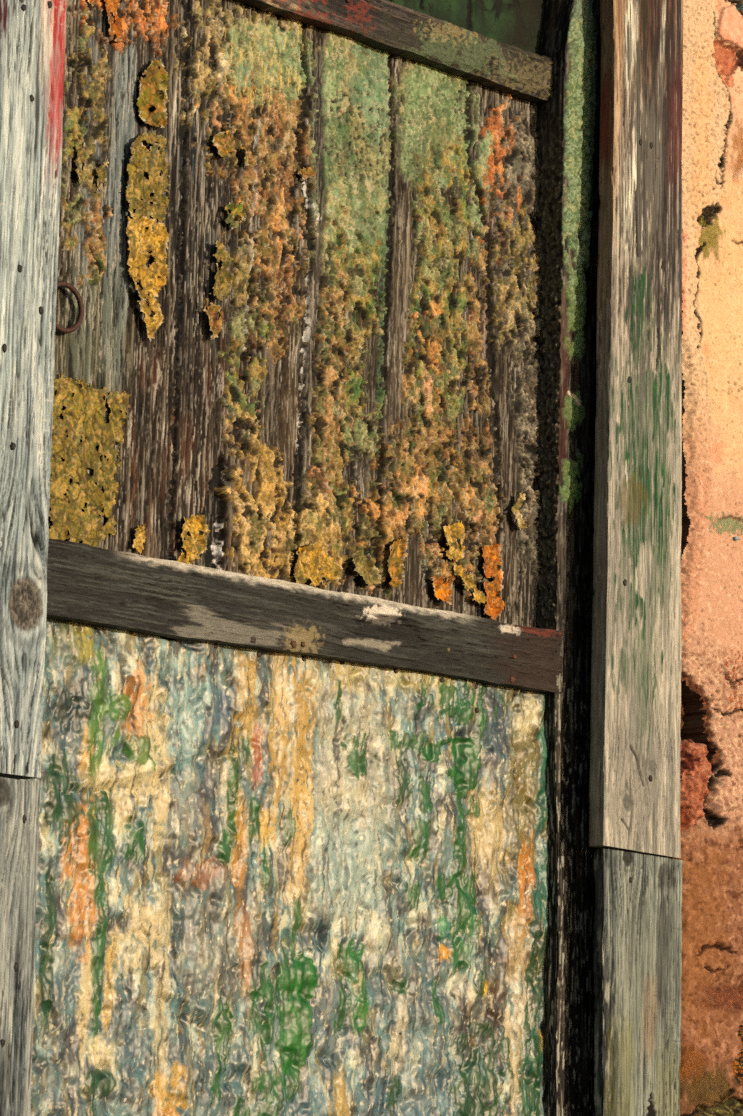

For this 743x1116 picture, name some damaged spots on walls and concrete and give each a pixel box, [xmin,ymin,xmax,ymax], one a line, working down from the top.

crack [715,76,732,184]
crack [712,678,743,716]
spalling [680,672,723,832]